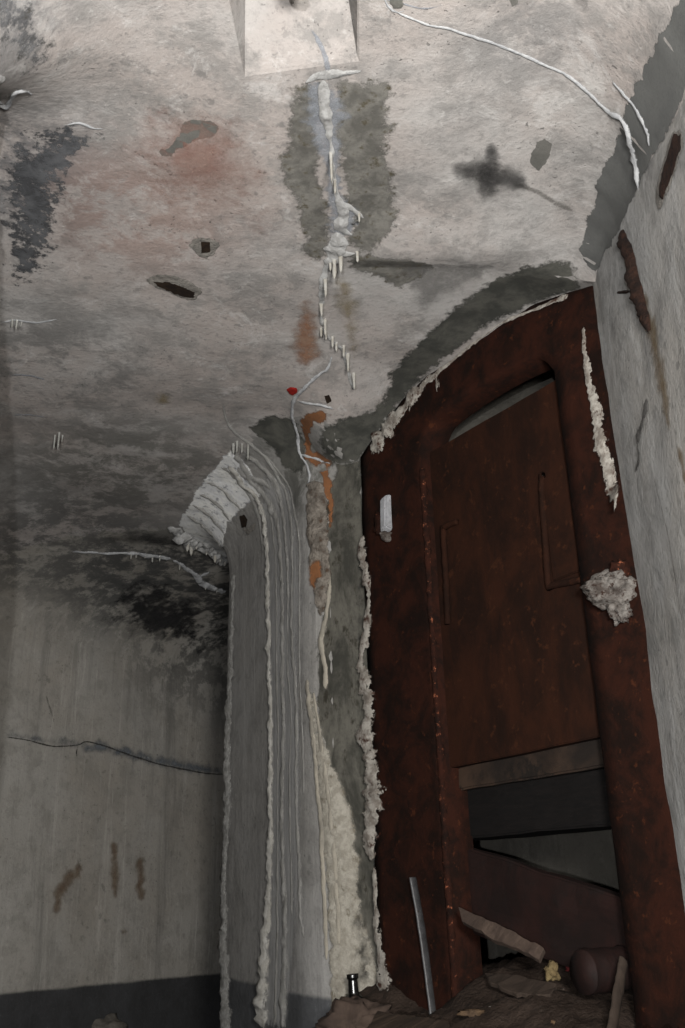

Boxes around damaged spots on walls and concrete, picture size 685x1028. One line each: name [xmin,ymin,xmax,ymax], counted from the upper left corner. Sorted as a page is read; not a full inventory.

water stain [0,90,32,110]
spalling [147,275,202,300]
spalling [249,415,332,689]
water stain [279,32,482,390]
peeling [319,0,685,470]
peeling [582,327,619,510]
crack [8,737,223,775]
water stain [73,405,378,1028]